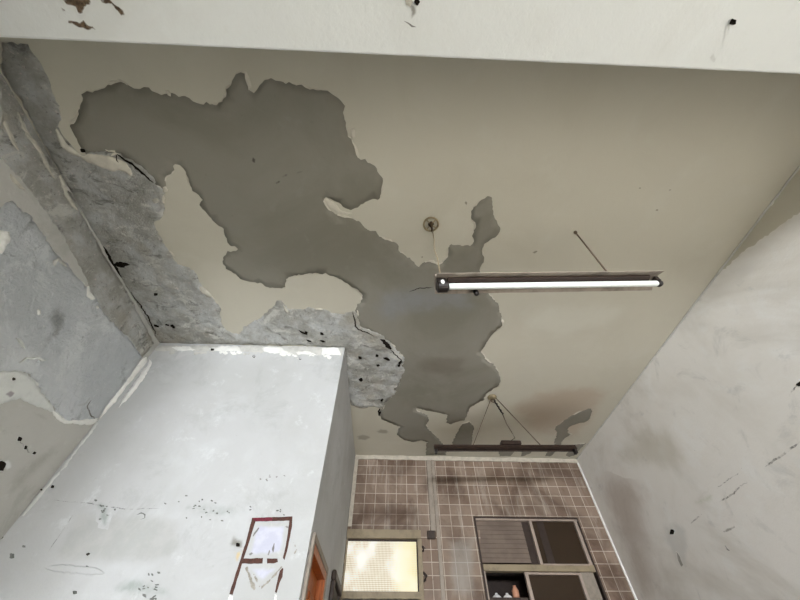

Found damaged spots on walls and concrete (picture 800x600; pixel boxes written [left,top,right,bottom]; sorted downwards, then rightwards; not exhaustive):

peeling [58,0,128,34]
peeling [0,42,504,455]
peeling [545,408,594,457]